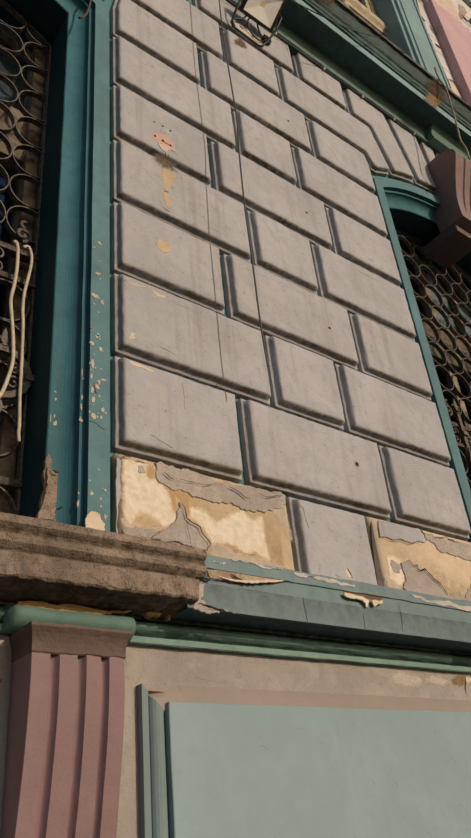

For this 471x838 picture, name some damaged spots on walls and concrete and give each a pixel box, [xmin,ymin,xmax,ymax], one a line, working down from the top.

peeling [161,167,178,212]
peeling [79,327,107,422]
spalling [36,453,62,522]
peeling [85,455,383,608]
peeling [370,520,471,612]